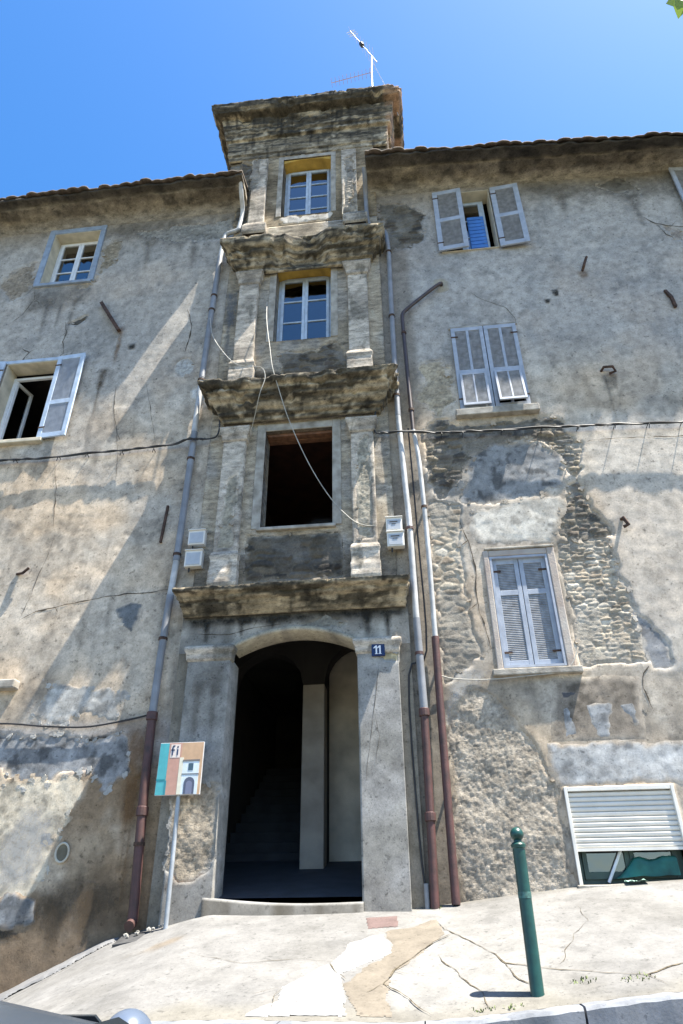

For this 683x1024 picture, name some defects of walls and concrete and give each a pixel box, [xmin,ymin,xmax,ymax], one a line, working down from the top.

spalling [415,359,673,684]
peeling [0,712,132,898]